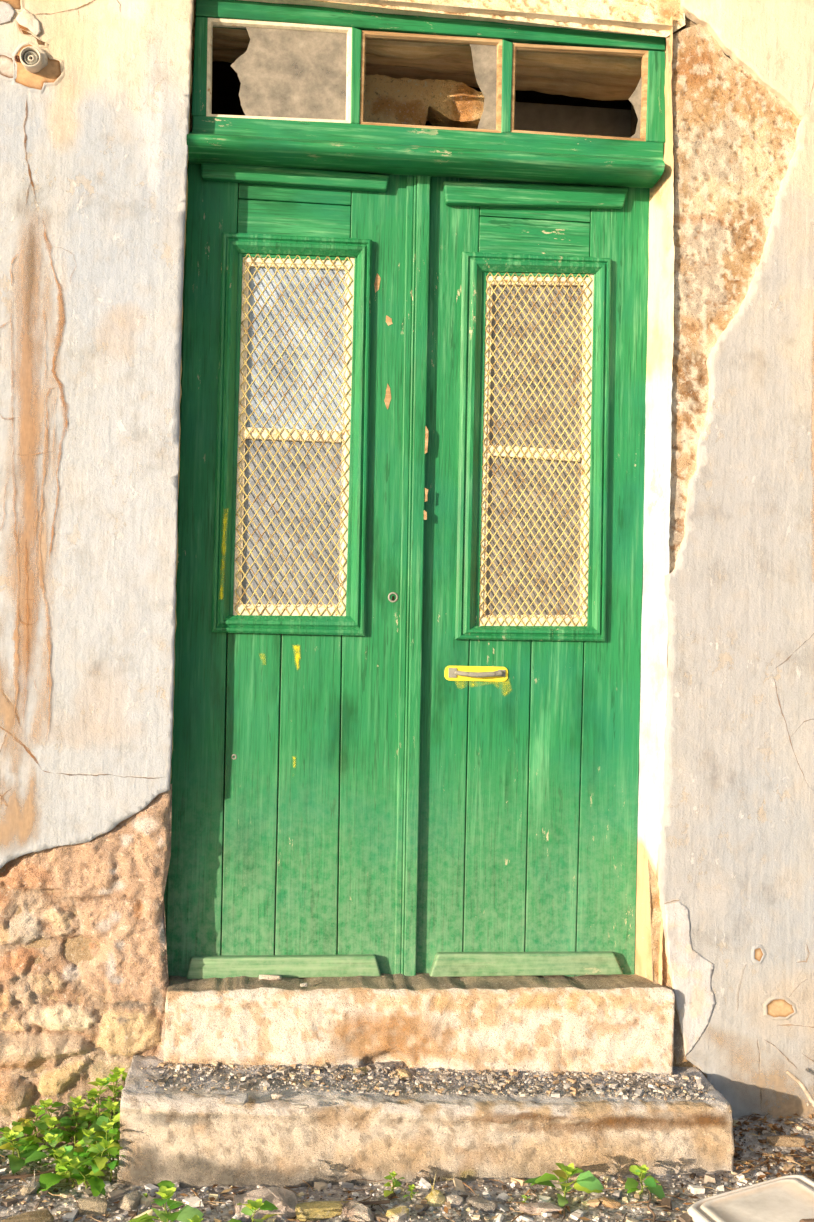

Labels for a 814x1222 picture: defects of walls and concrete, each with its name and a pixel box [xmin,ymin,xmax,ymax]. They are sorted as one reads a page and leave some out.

spalling [0,0,65,94]
spalling [312,0,801,573]
crack [0,684,155,779]
crack [774,634,814,787]
spalling [135,860,716,1100]